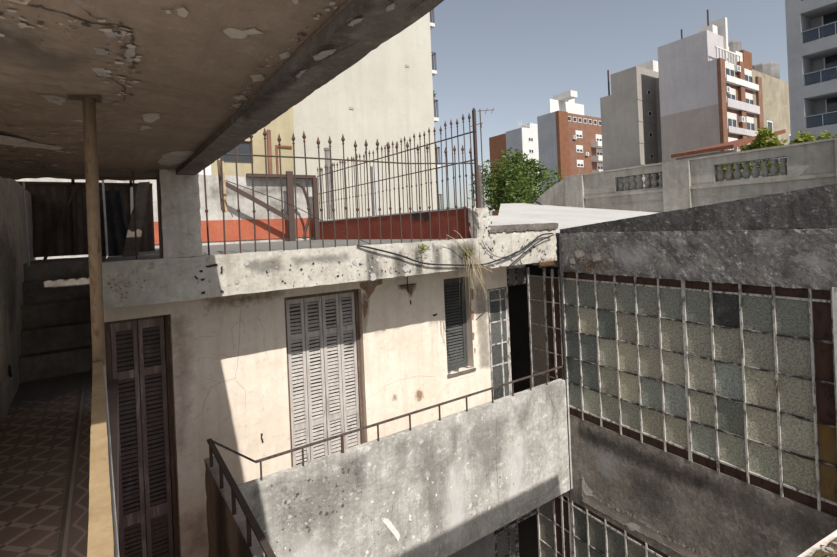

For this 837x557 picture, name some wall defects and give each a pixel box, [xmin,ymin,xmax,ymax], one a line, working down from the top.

spalling [0,0,142,96]
peeling [220,26,263,39]
peeling [227,2,339,112]
spalling [351,246,425,320]